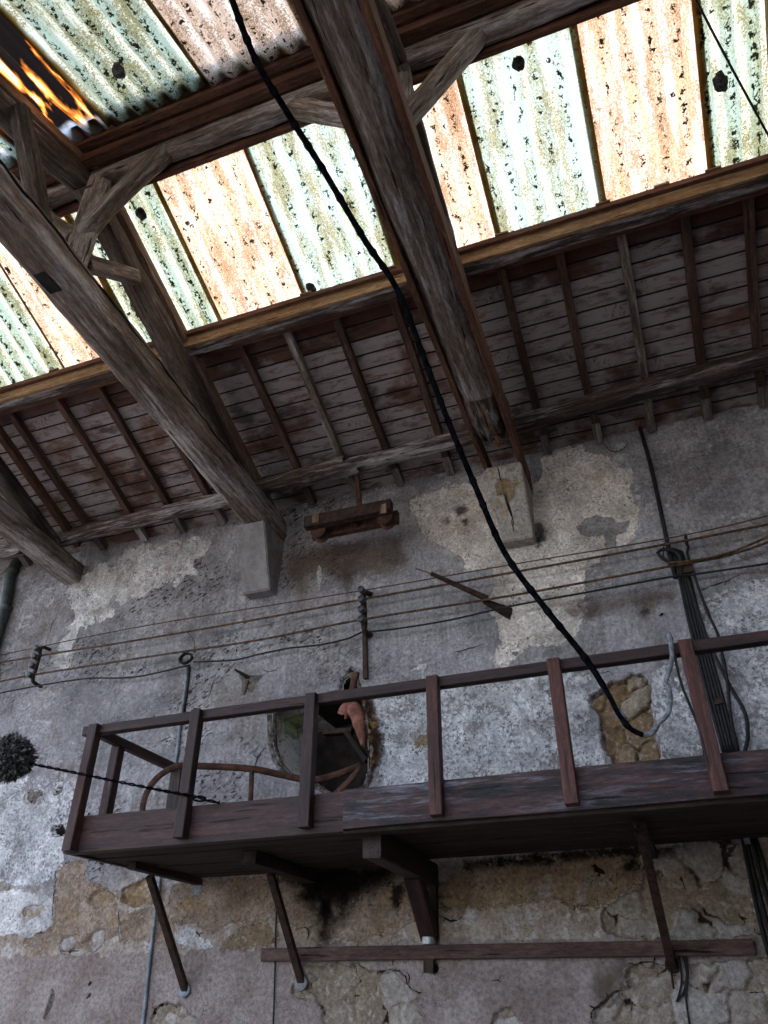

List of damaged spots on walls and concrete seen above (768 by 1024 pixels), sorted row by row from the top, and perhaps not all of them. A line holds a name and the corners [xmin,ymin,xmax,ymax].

crack [497,466,514,531]
flaking render [50,536,211,669]
flaking render [409,444,641,668]
peeling [315,672,428,793]
peeling [440,675,560,780]
spalling [562,661,702,767]
peeling [0,773,415,957]
damp [303,885,348,941]
damp [390,885,403,907]
spalling [438,840,753,941]
spalling [292,962,424,1024]
spalling [592,958,768,1024]